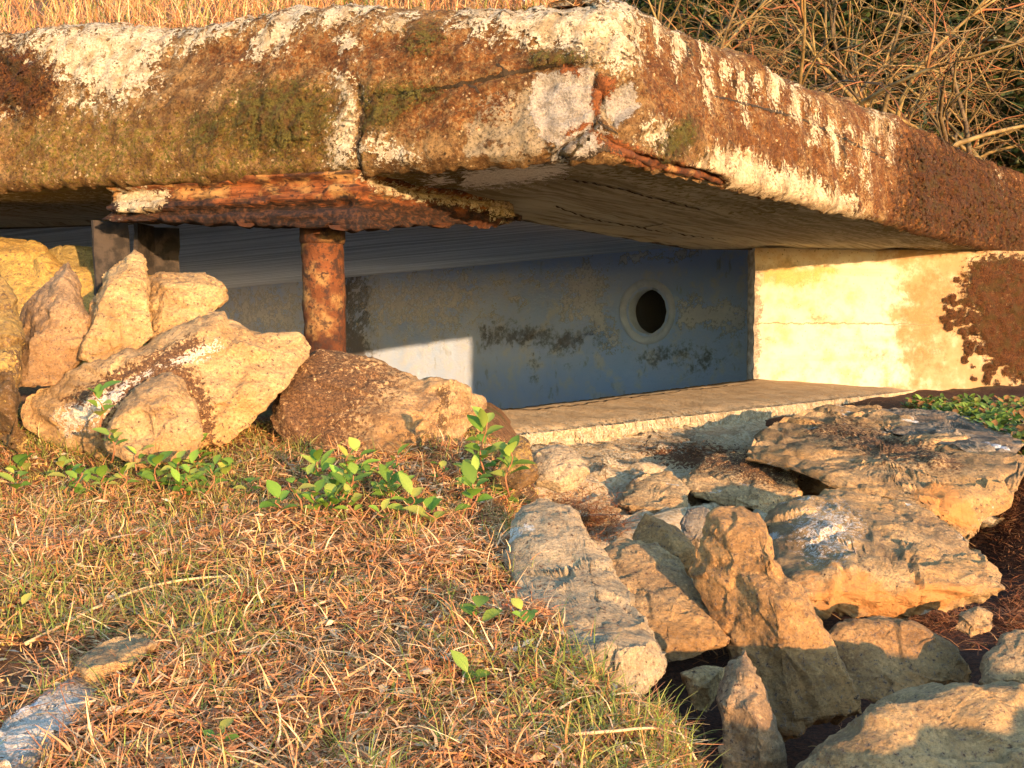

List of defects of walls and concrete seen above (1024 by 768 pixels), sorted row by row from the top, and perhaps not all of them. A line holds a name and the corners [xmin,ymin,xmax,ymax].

water stain [0,2,580,226]
crack [347,61,736,241]
spalling [526,62,730,188]
water stain [480,326,611,350]